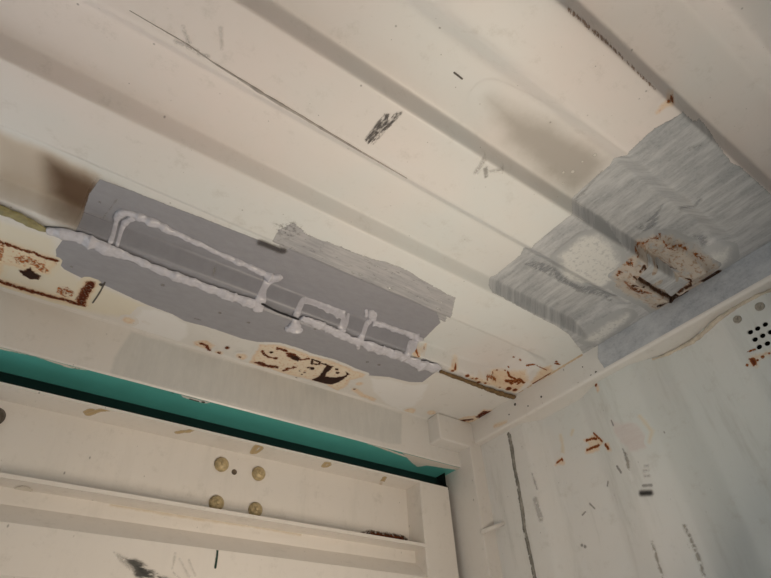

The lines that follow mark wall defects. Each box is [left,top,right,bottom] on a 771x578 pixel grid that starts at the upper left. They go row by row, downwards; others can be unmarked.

water stain [0,125,110,256]
water stain [5,266,81,296]
corrosion [0,237,102,310]
corrosion [608,229,722,314]
water stain [56,285,149,322]
corrosion [188,338,379,403]
corrosion [445,352,560,395]
corrosion [743,344,771,372]
corrosion [456,408,495,423]
corrosion [581,431,614,457]
corrosion [361,530,407,540]